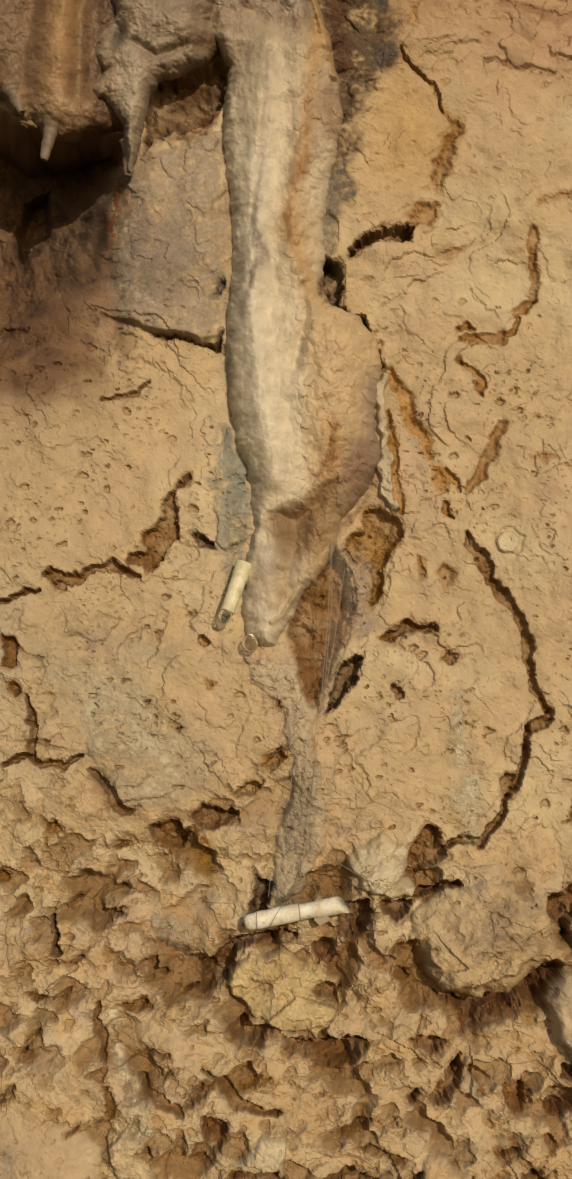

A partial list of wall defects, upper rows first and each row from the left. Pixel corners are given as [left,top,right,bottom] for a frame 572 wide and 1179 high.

crack [472,0,572,31]
water stain [318,0,397,252]
crack [142,325,226,357]
crack [322,50,572,852]
crack [0,469,219,817]
spalling [37,818,81,879]
spalling [104,743,292,855]
spalling [0,878,133,1111]
spalling [114,818,572,1111]
spalling [180,1006,375,1179]
spalling [320,1112,430,1179]
spalling [488,1058,572,1179]